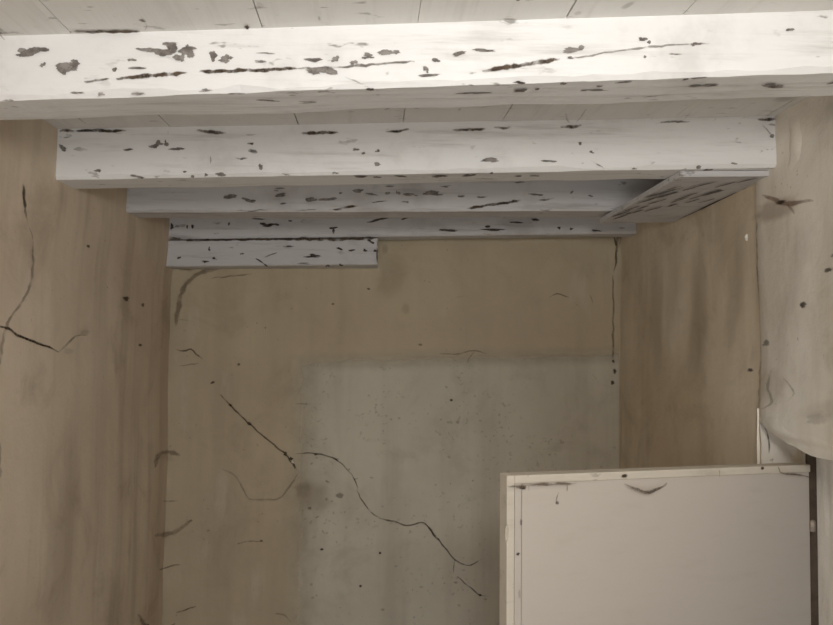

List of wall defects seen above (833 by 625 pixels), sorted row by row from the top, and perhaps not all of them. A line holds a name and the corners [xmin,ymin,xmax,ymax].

peeling [16,47,49,57]
peeling [56,59,80,75]
peeling [127,42,197,69]
peeling [209,51,233,64]
peeling [304,56,339,75]
peeling [350,49,400,65]
peeling [563,45,584,59]
peeling [353,175,450,203]
peeling [613,178,756,219]
crack [0,326,58,352]
crack [211,381,368,508]
crack [386,520,482,596]